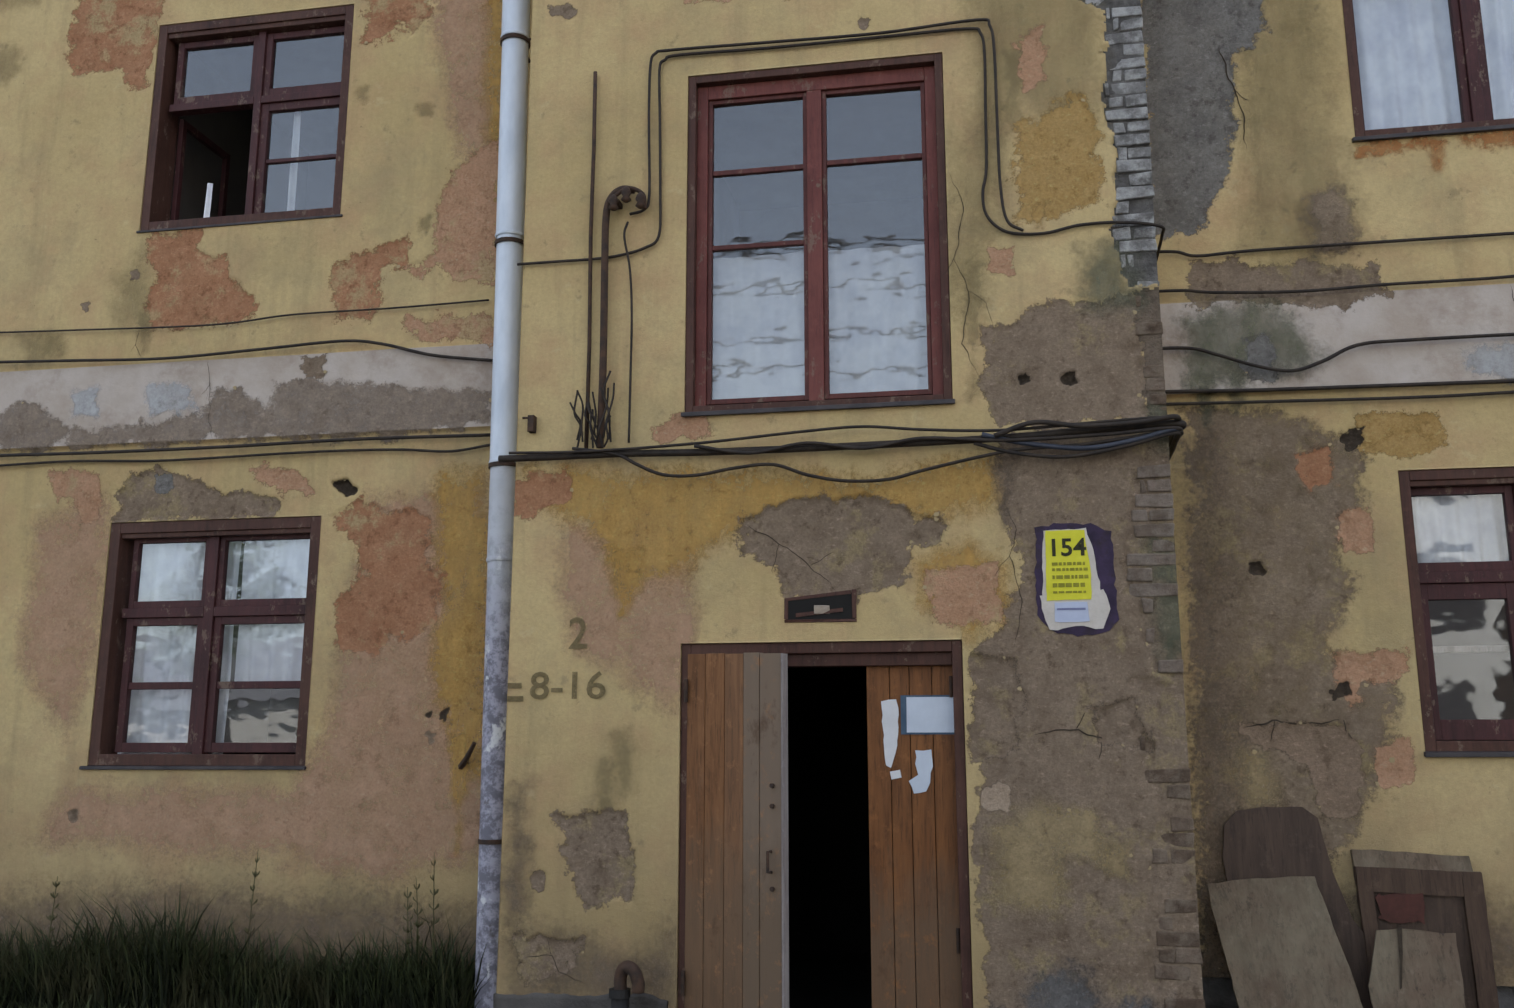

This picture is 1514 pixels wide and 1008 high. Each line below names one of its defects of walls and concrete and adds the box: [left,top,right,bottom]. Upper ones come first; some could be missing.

peeling [63,0,165,91]
peeling [130,228,259,331]
peeling [328,140,499,321]
peeling [0,353,492,523]
flaking render [732,0,1449,1008]
peeling [333,495,450,658]
crack [1039,713,1102,758]
spalling [530,870,546,893]
flaking render [549,807,636,912]
spalling [512,930,586,986]